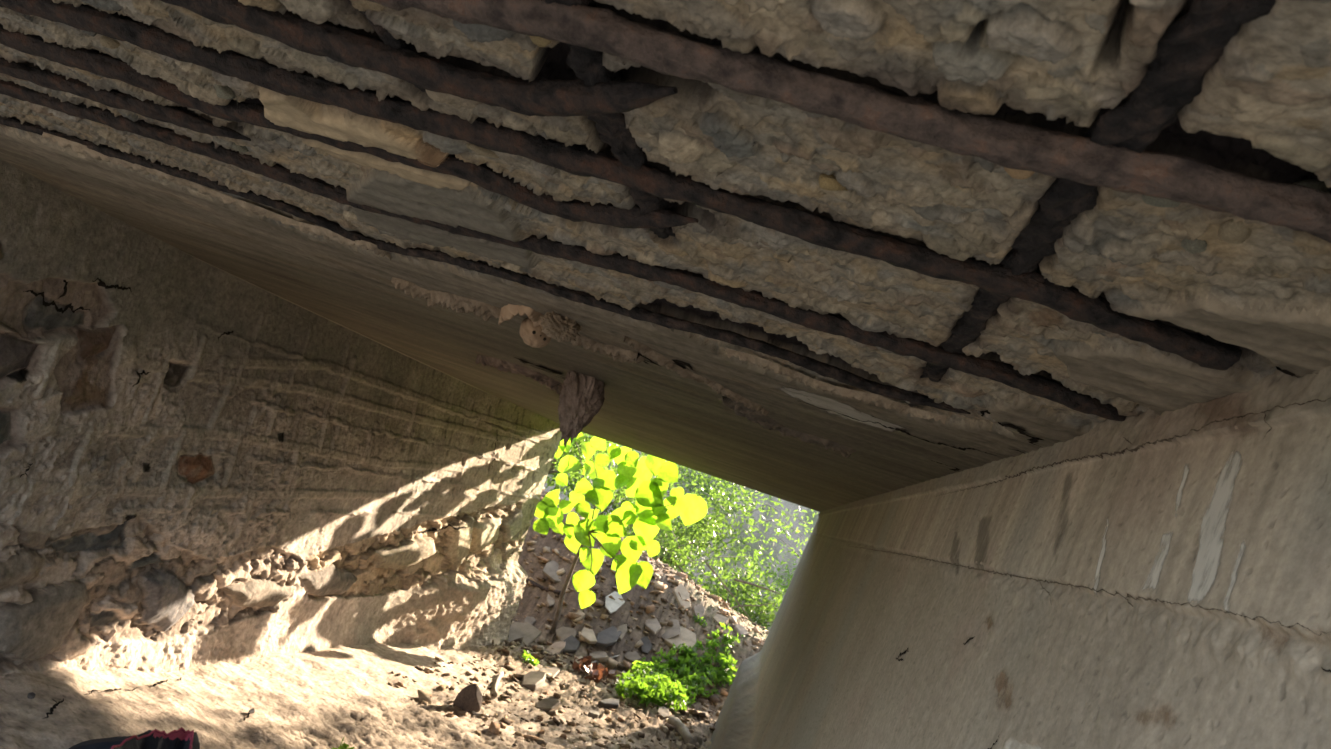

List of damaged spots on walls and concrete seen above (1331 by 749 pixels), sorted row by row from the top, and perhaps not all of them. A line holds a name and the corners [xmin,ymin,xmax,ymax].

spalling [0,0,1331,435]
peeling [0,406,27,454]
crack [802,366,1331,496]
crack [846,545,1331,673]